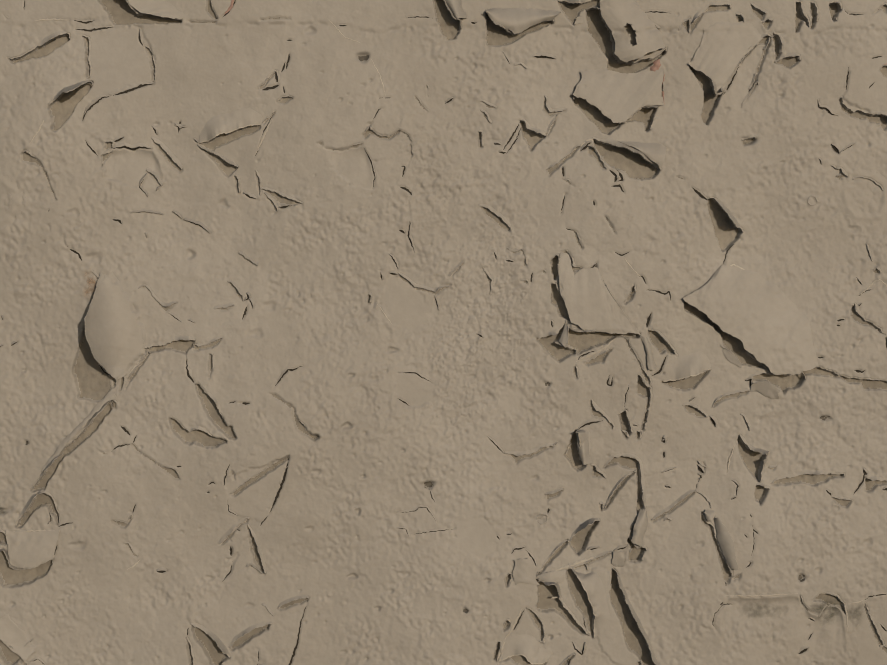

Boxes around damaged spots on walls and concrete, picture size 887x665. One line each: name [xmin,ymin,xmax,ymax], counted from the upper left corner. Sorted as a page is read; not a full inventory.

peeling [126,0,235,23]
peeling [485,0,667,129]
peeling [678,1,801,96]
peeling [86,126,183,170]
peeling [194,55,303,211]
peeling [547,137,666,193]
peeling [673,168,744,232]
peeling [0,269,250,570]
crack [103,426,181,478]
peeling [275,365,303,386]
peeling [487,250,712,665]
peeling [682,244,887,427]